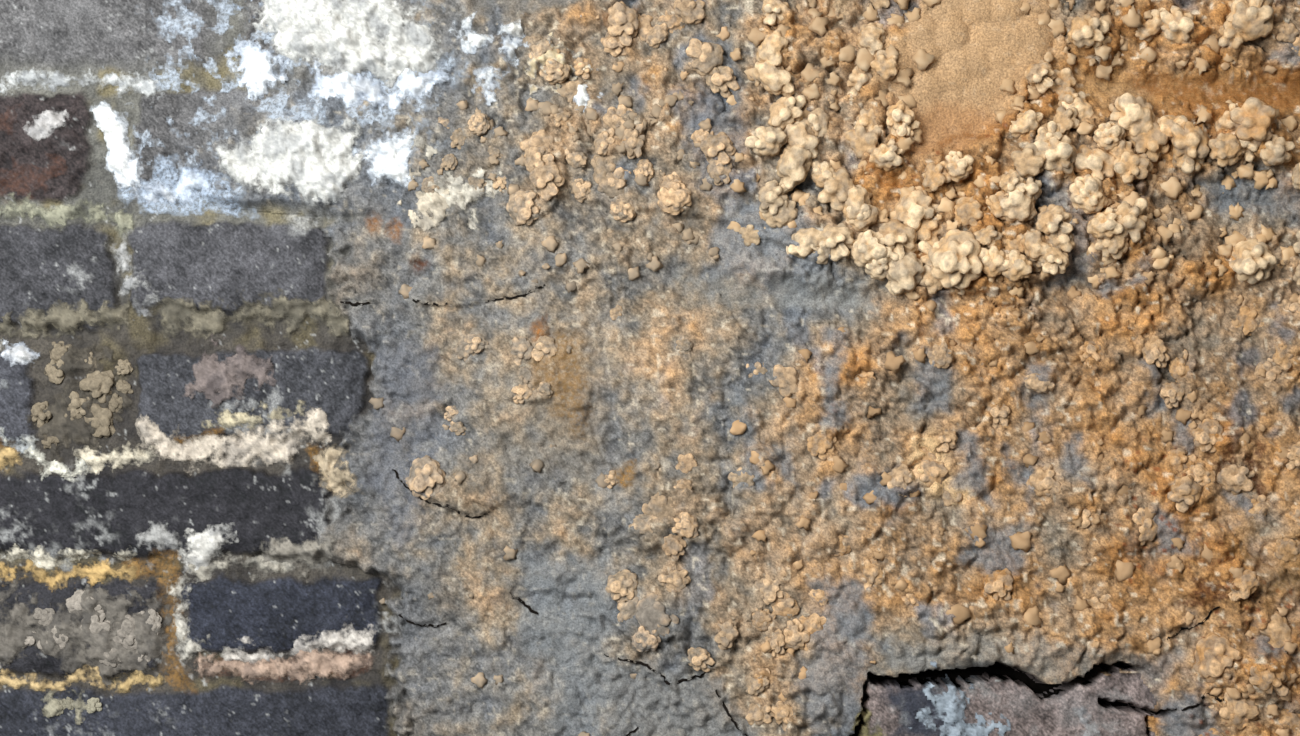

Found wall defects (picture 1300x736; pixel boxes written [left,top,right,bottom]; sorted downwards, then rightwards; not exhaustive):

leakage [158,0,204,59]
leakage [215,2,234,34]
leakage [461,13,493,54]
leakage [473,66,501,105]
leakage [26,110,68,141]
leakage [92,101,241,215]
leakage [216,118,416,206]
leakage [413,135,437,160]
leakage [408,171,484,231]
leakage [484,180,500,199]
crack [1167,606,1220,640]
crack [855,662,1232,733]